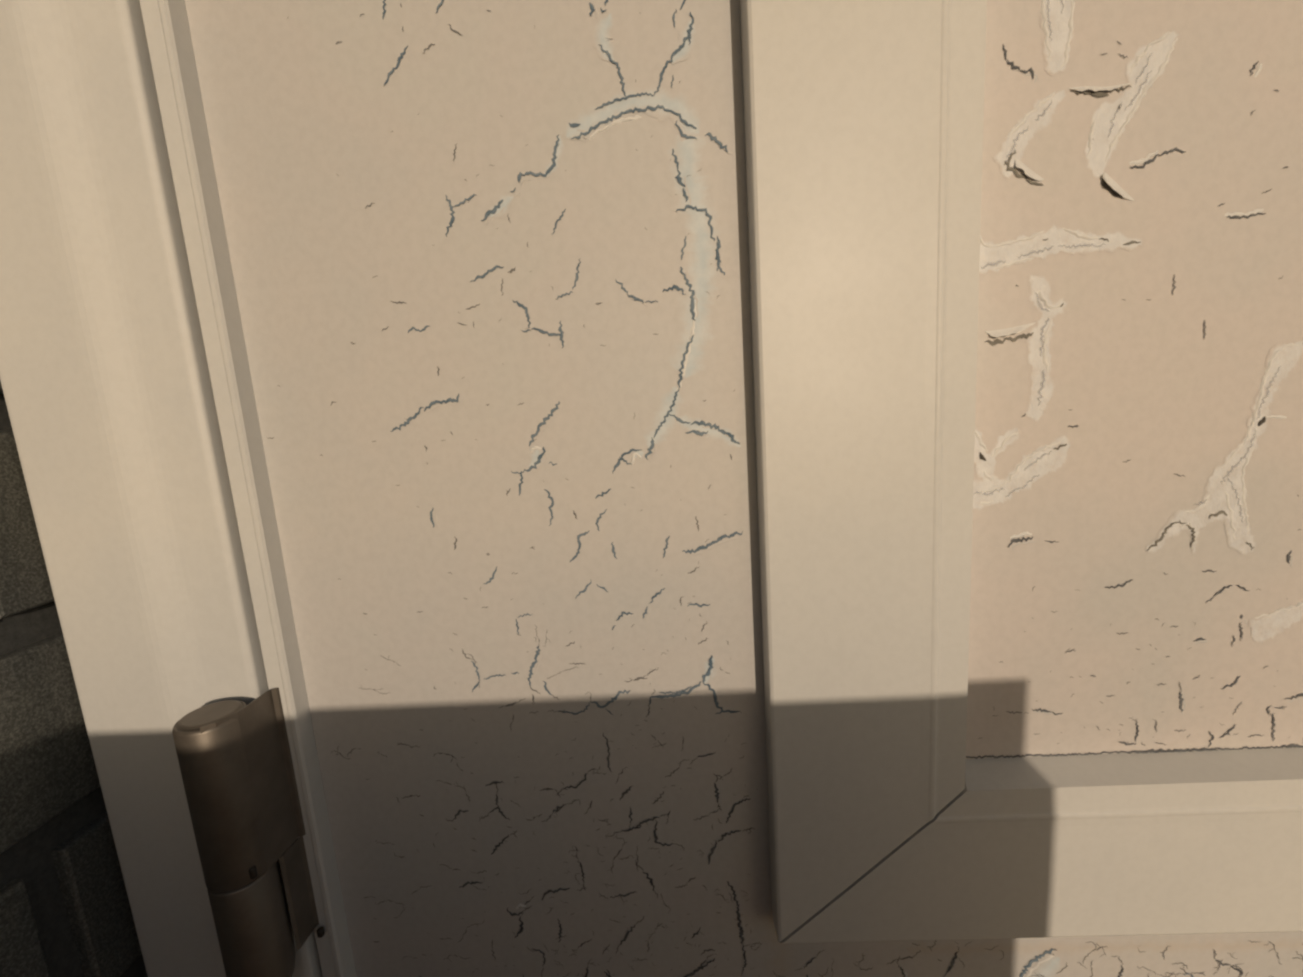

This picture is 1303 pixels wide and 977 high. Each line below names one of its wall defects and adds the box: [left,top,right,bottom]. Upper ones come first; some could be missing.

peeling [992,0,1180,201]
crack [334,0,1303,977]
peeling [973,224,1143,511]
peeling [1145,340,1303,555]
peeling [1248,602,1303,644]